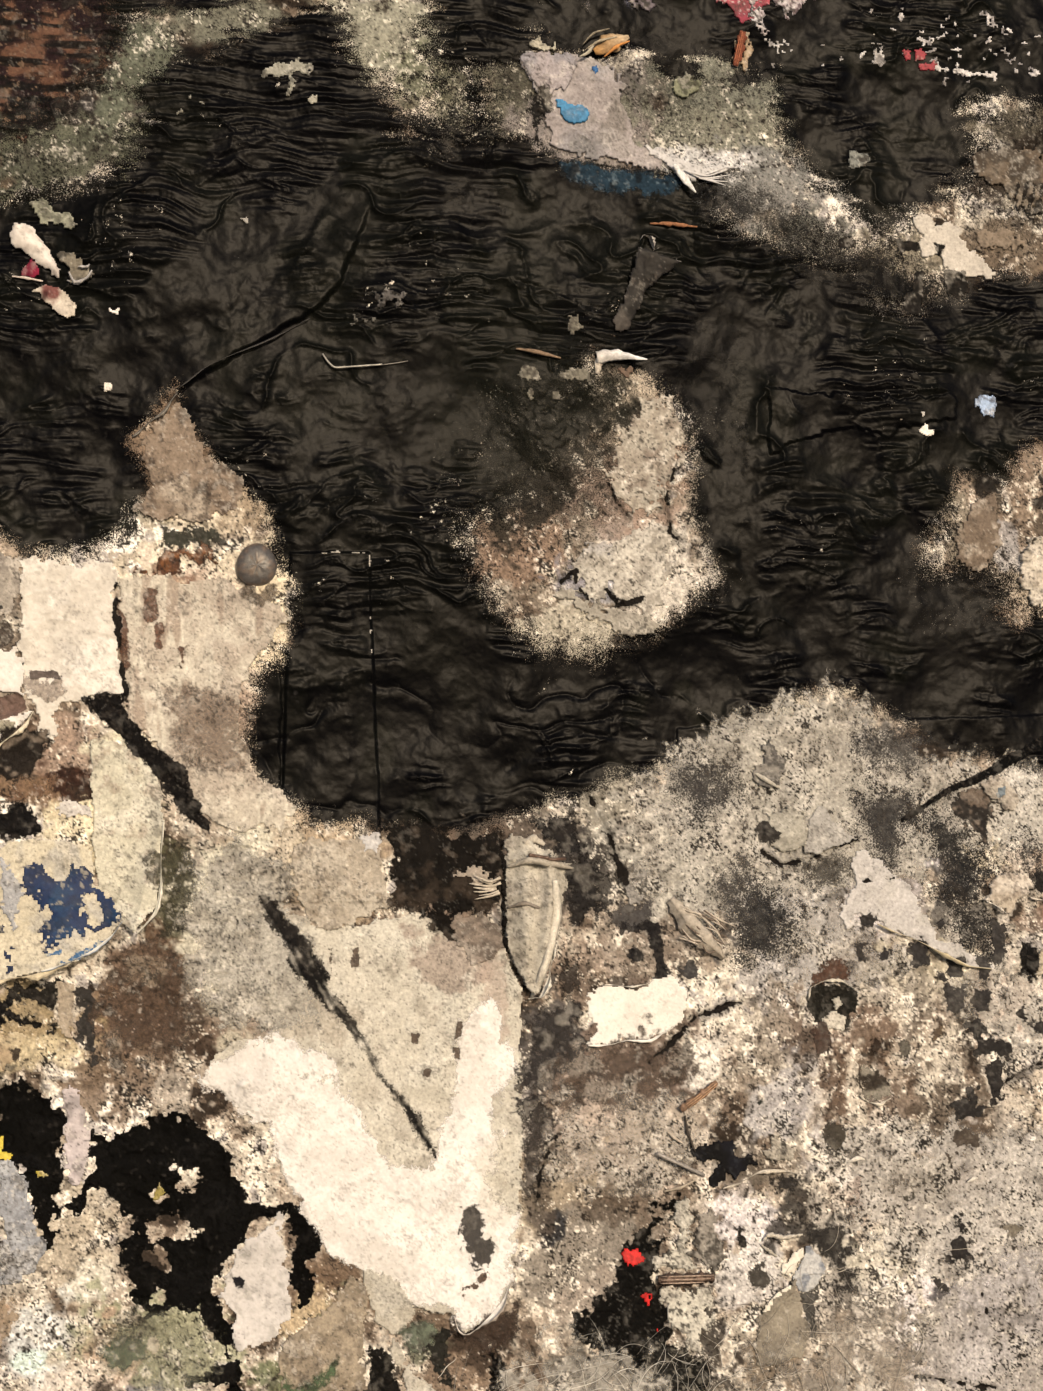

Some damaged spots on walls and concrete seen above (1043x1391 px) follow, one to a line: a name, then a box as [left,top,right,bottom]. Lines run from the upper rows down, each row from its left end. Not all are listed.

peeling [519,35,662,171]
peeling [0,552,297,836]
peeling [450,910,505,965]
peeling [586,975,687,1045]
crack [648,1001,741,1064]
peeling [218,1211,436,1391]